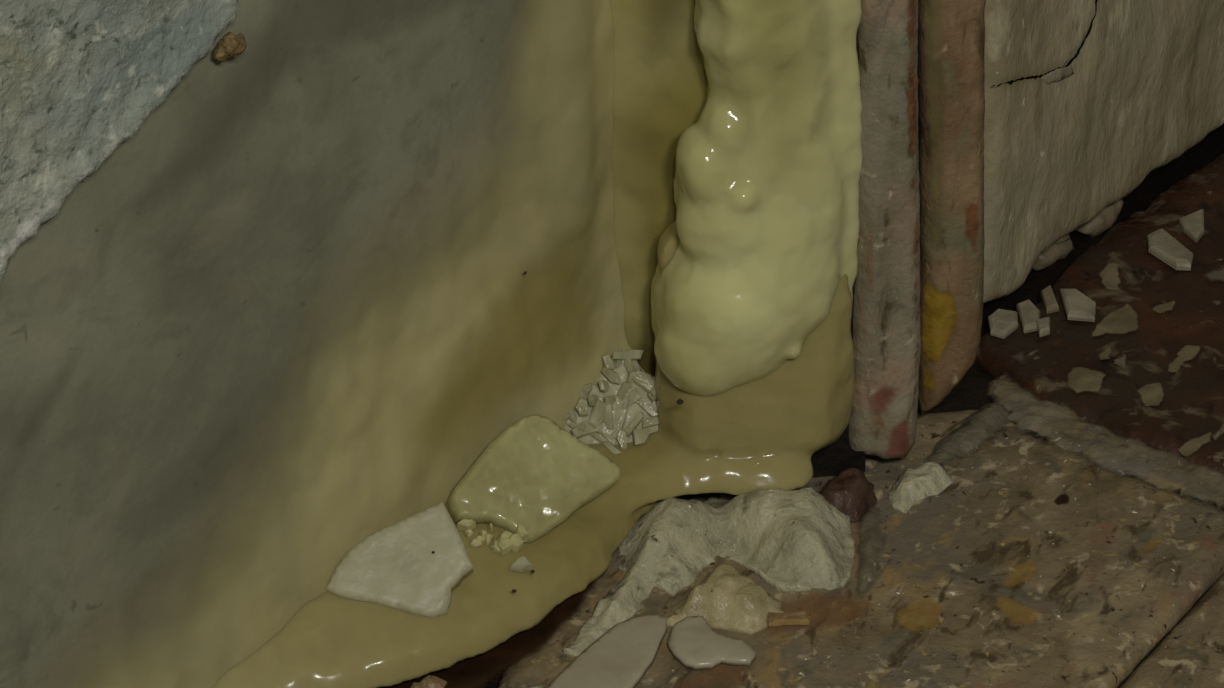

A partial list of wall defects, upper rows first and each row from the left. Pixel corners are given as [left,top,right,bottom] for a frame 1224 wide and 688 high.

corrosion [908,0,918,156]
crack [992,0,1098,86]
corrosion [915,284,956,390]